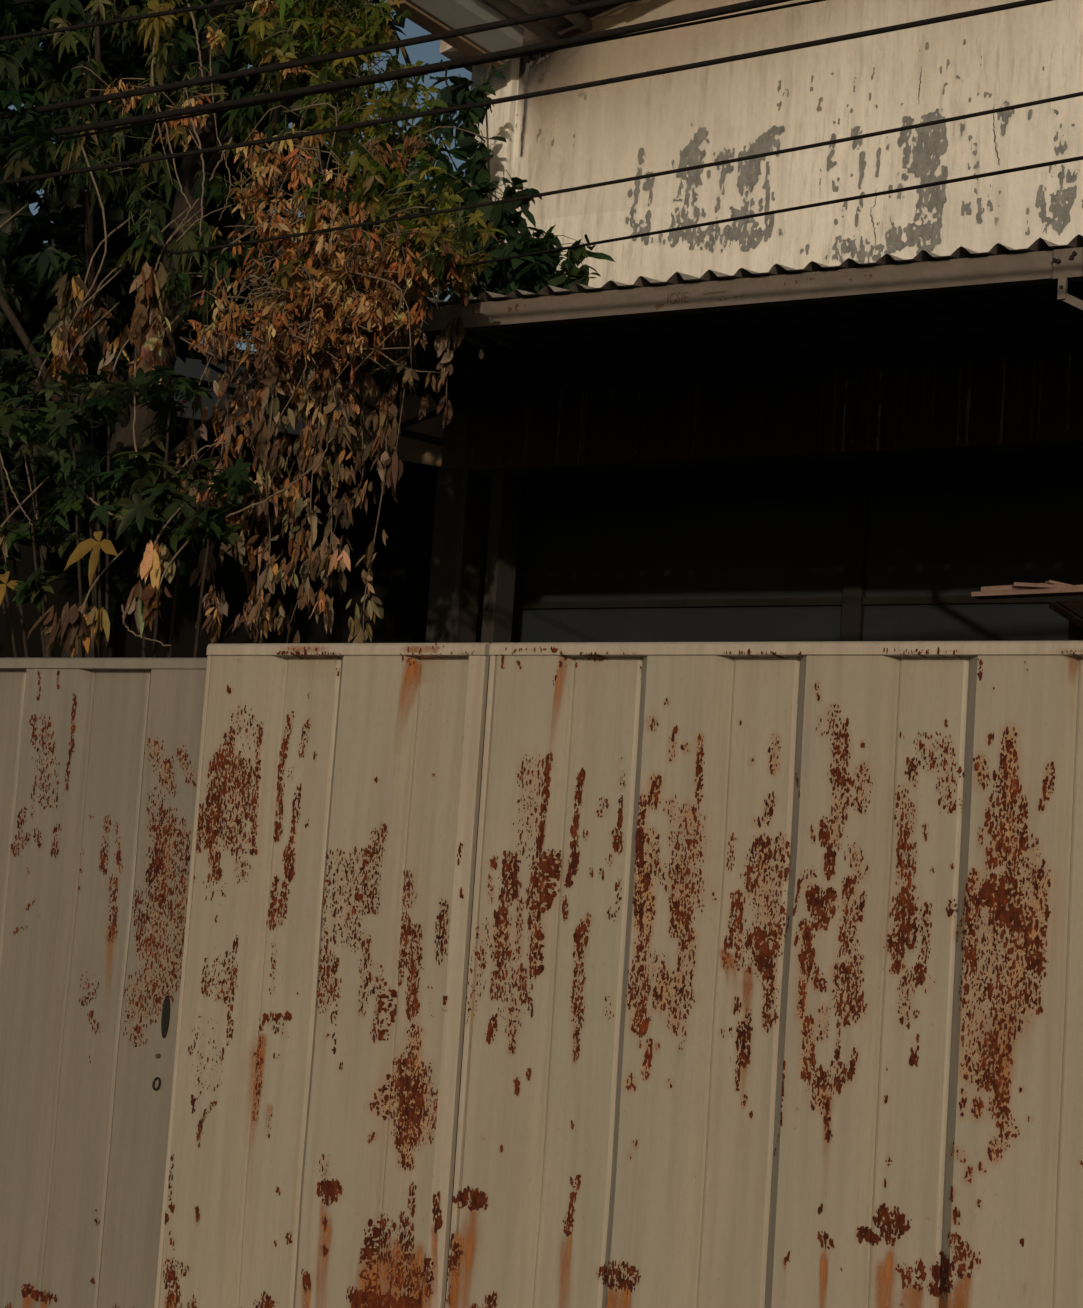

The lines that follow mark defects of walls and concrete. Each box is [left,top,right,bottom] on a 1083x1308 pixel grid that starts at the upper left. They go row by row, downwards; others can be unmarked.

peeling [625,123,785,253]
peeling [819,108,1001,263]
peeling [997,101,1033,136]
peeling [1025,109,1083,236]
rust [10,670,77,872]
rust [78,685,317,1047]
rust [188,935,239,1148]
rust [315,824,497,1308]
rust [467,683,873,1156]
rust [856,719,1055,1308]
rust [301,1154,344,1308]
rust [596,1260,641,1308]